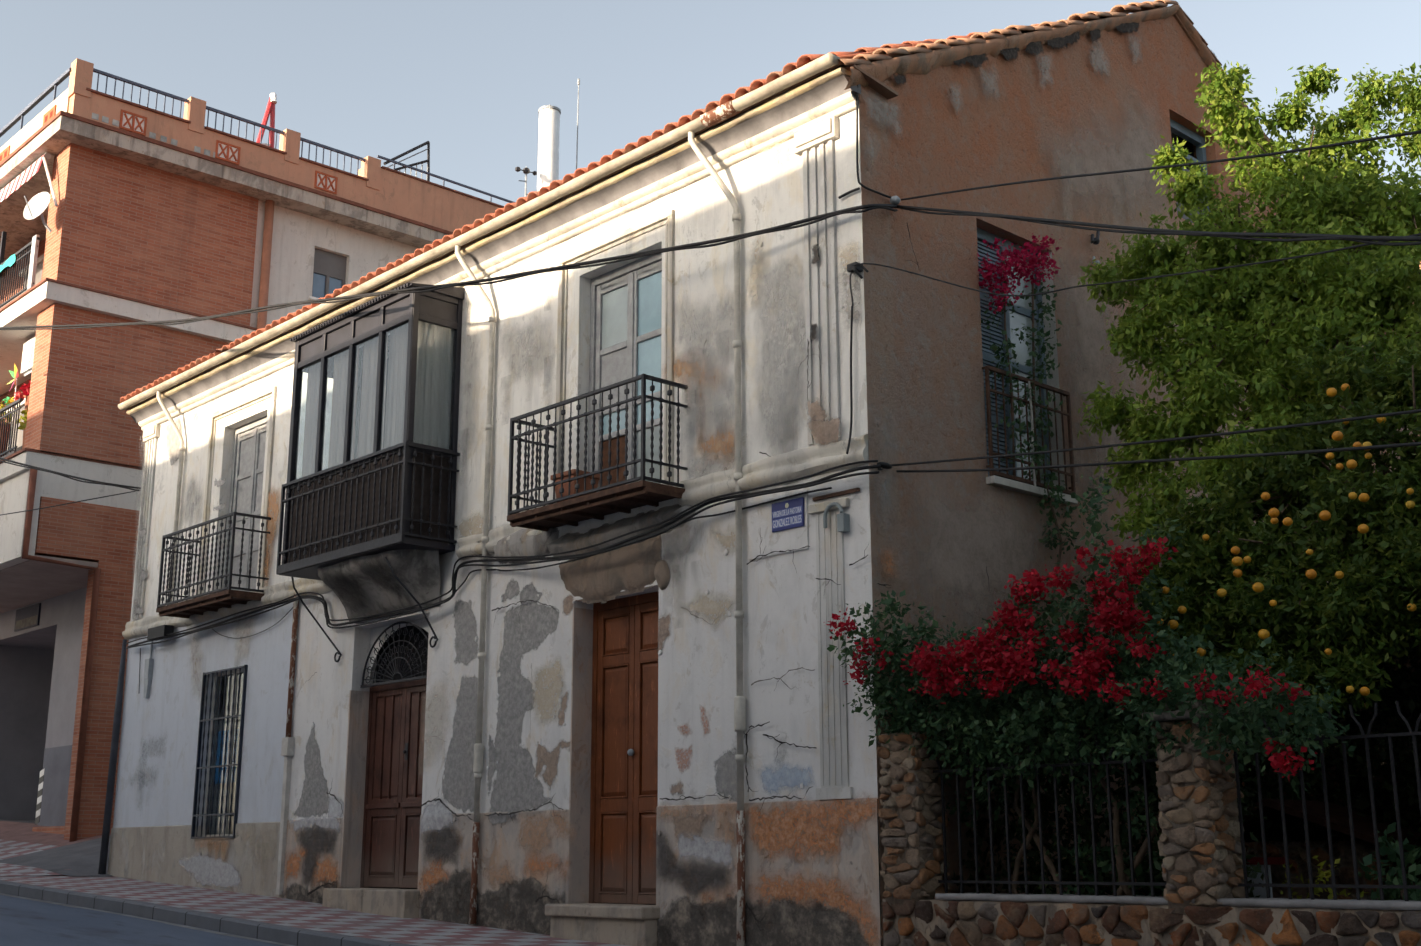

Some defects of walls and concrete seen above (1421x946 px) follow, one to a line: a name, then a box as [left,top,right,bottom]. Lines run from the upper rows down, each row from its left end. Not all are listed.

spalling [421,580,576,831]
crack [660,667,817,815]
spalling [291,723,344,830]
spalling [671,782,683,796]
spalling [714,748,737,801]
spalling [283,848,338,904]
water stain [298,823,336,884]
spalling [657,894,869,946]